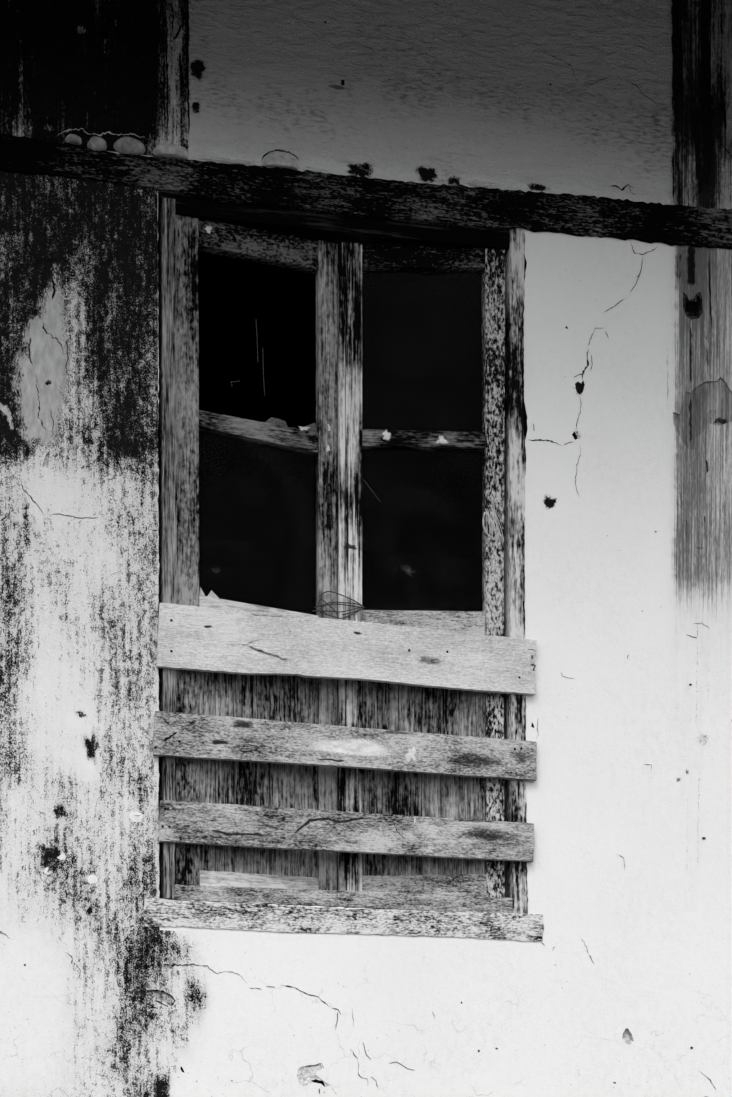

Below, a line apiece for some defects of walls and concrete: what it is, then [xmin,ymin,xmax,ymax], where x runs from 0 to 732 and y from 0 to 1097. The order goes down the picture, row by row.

water stain [0,0,206,160]
crack [531,246,658,493]
peeling [673,377,732,450]
water stain [0,171,206,1097]
crack [159,964,413,1087]
spalling [297,1063,333,1094]